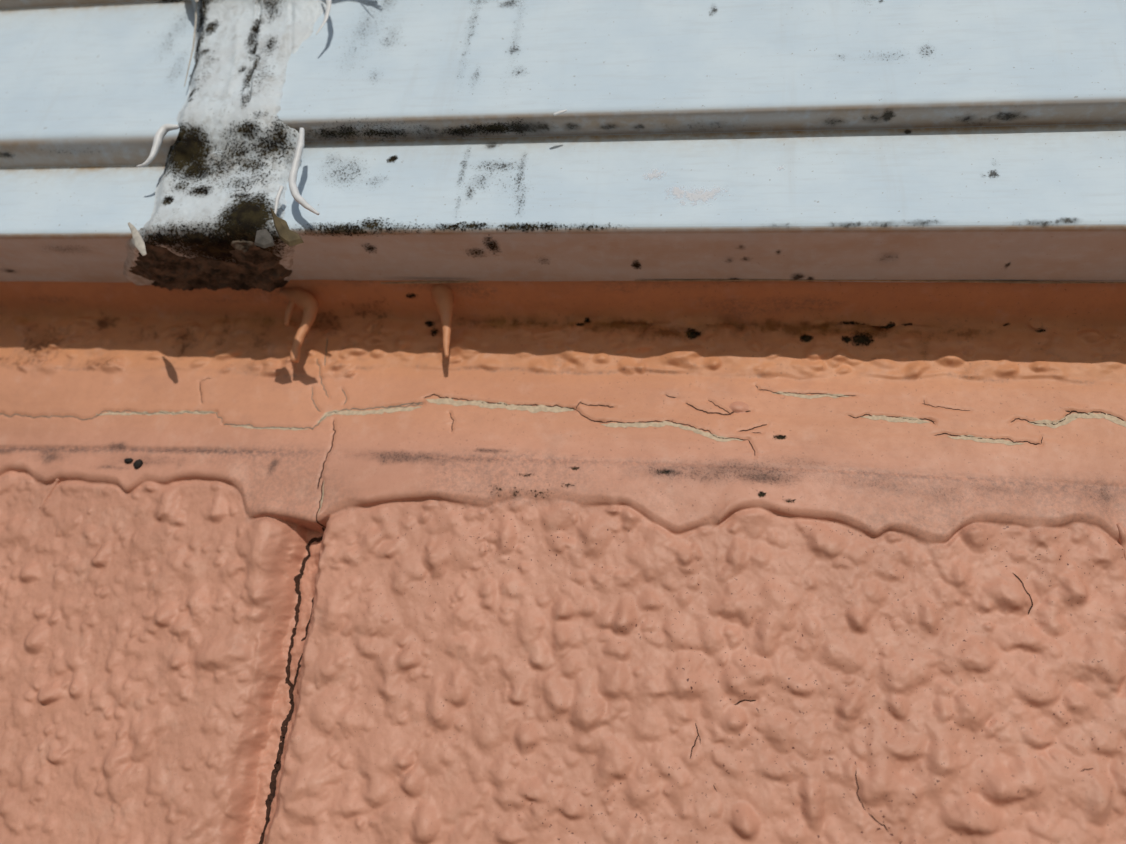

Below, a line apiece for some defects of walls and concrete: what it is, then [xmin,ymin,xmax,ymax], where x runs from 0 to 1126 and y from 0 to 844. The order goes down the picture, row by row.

peeling [137,124,179,168]
peeling [274,128,320,215]
leakage [129,0,622,292]
leakage [840,321,912,346]
crack [0,339,1126,844]